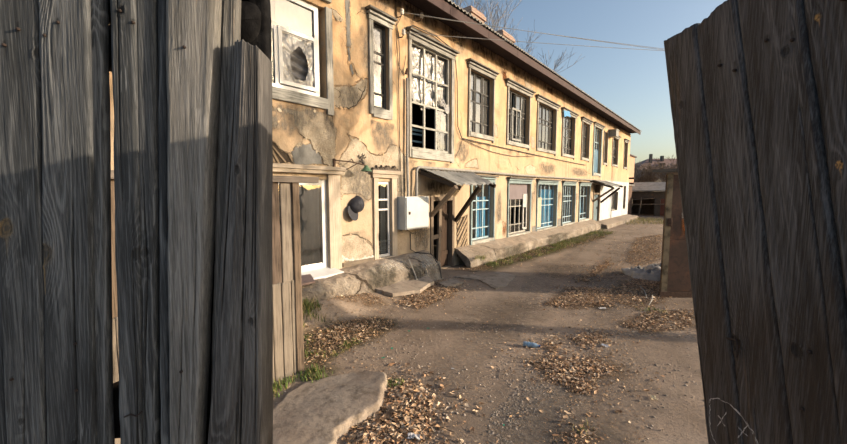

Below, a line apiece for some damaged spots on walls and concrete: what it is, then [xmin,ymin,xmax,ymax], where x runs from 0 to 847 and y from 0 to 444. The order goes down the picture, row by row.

flaking render [272,0,406,201]
flaking render [342,233,374,262]